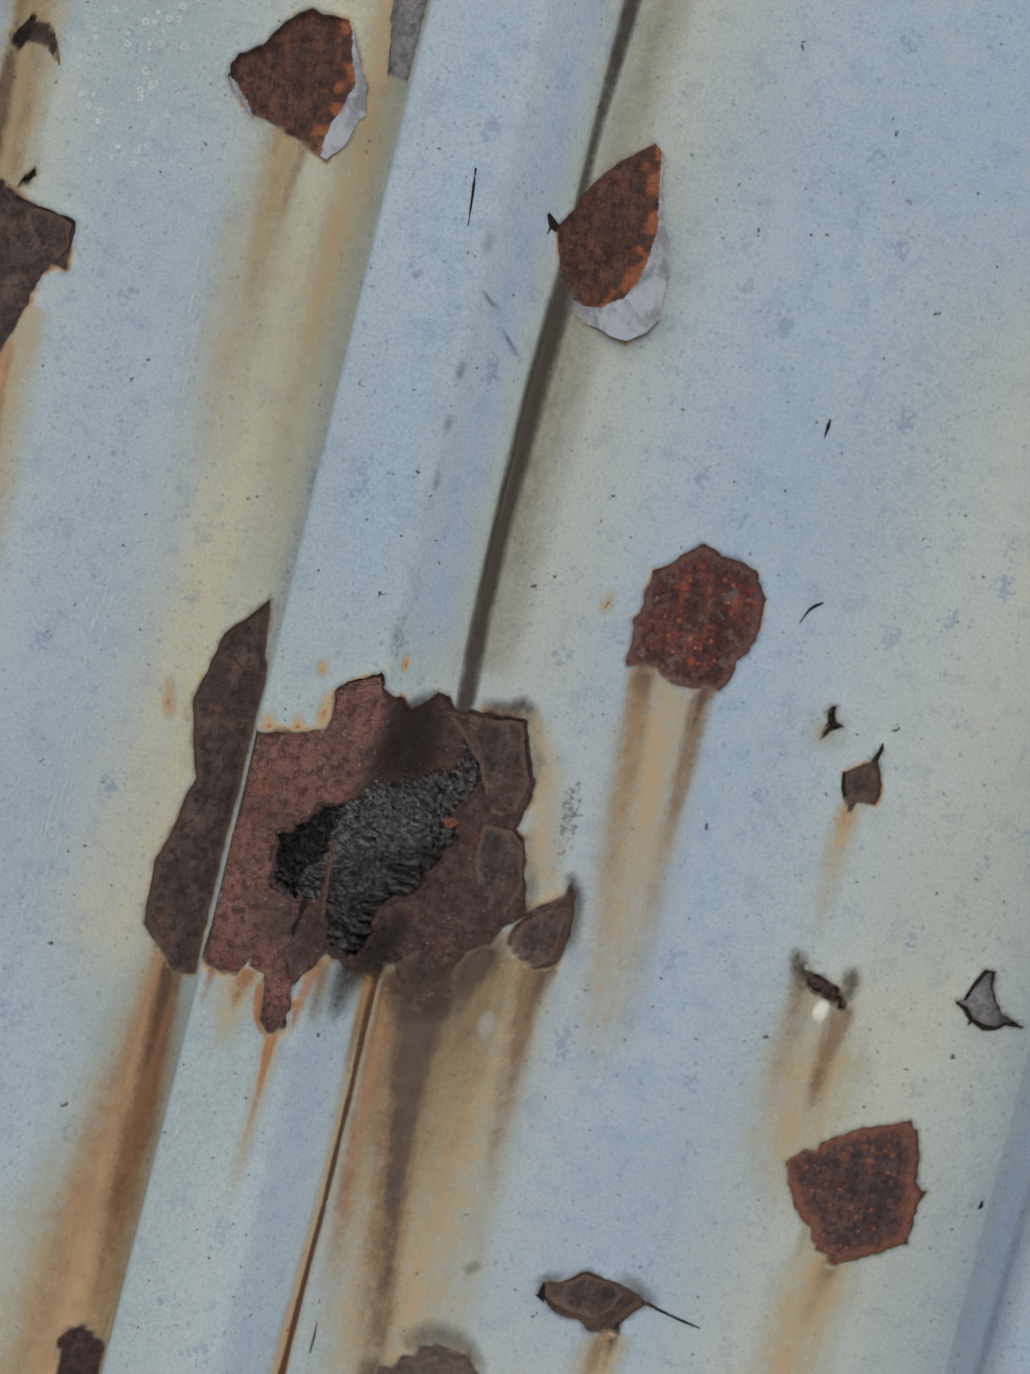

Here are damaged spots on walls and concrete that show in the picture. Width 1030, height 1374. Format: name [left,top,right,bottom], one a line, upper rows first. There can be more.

rust [0,176,76,495]
rust [0,600,575,1374]
rust [596,544,766,993]
rust [761,953,925,1374]
rust [829,743,884,867]